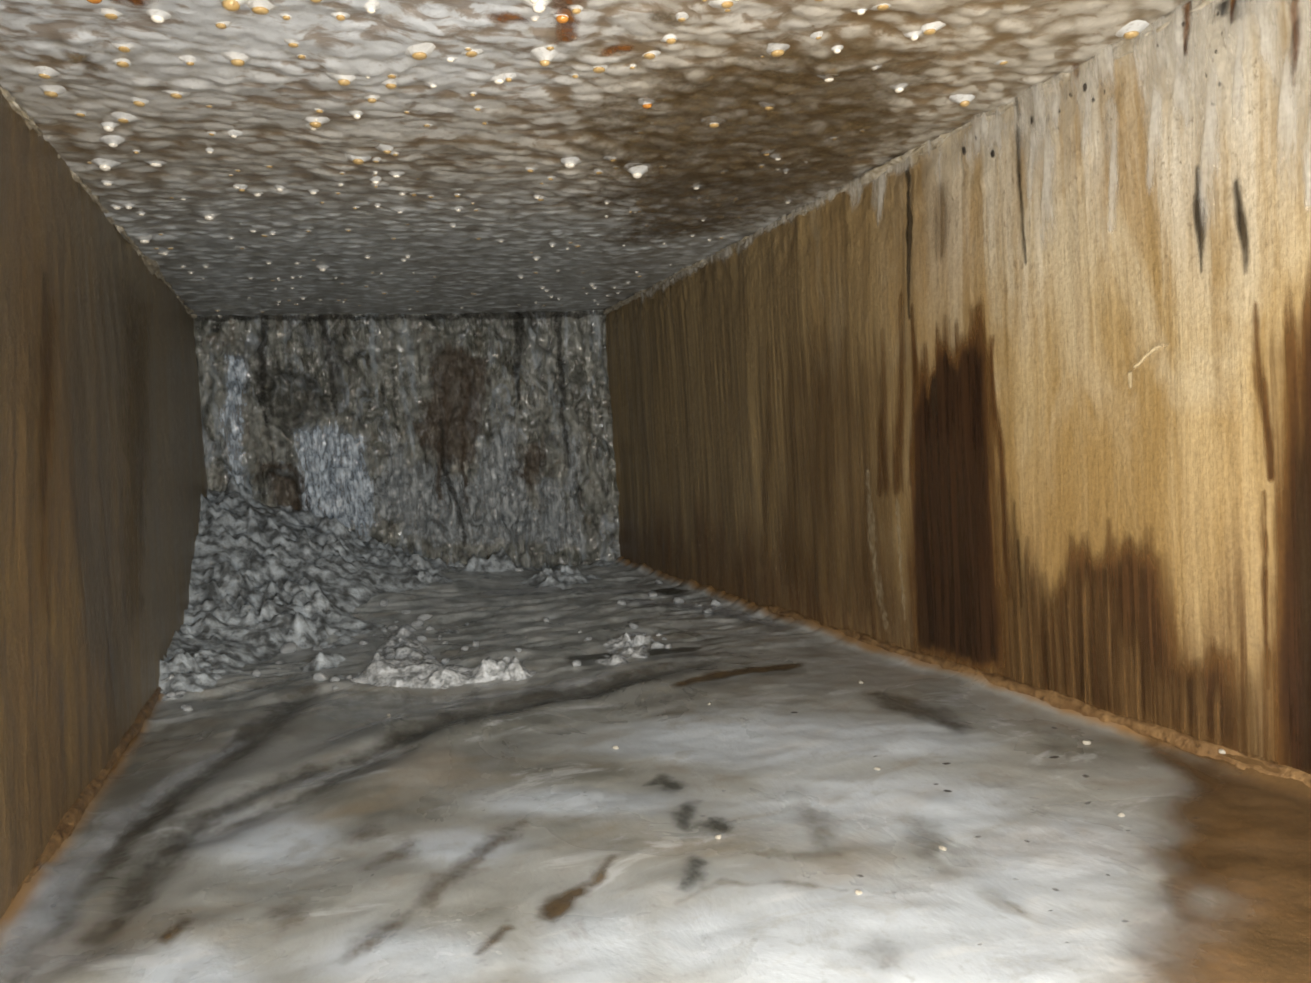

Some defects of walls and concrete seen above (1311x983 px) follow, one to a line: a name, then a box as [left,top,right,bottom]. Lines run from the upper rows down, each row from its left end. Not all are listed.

leakage [0,87,43,137]
leakage [65,51,97,71]
leakage [590,0,1311,319]
leakage [58,154,197,319]
leakage [220,355,247,484]
leakage [294,417,587,554]
leakage [1007,525,1221,745]